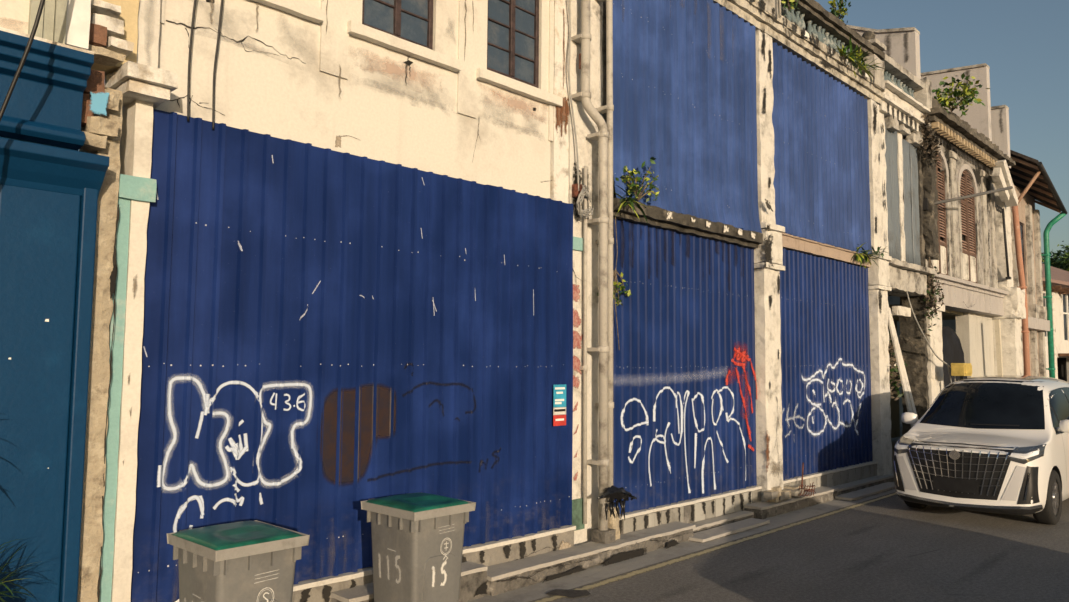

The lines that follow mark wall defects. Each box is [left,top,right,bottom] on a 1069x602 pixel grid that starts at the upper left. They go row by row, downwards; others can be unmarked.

crack [166,20,306,64]